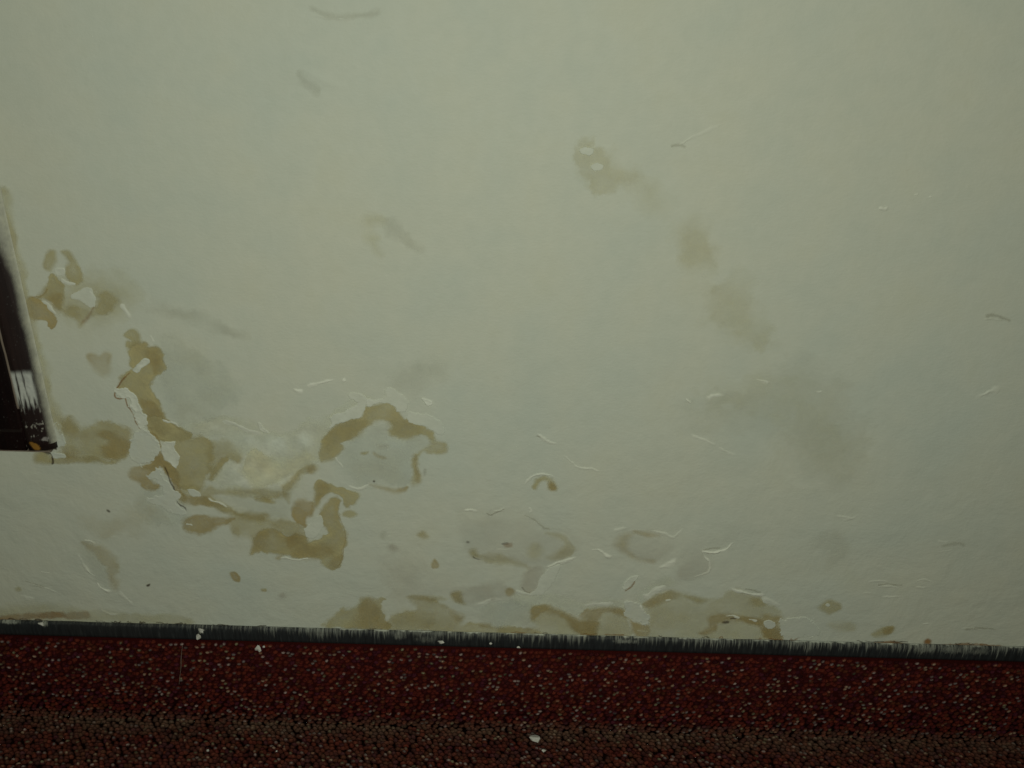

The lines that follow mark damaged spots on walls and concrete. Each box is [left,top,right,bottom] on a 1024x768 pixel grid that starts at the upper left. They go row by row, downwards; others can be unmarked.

damp [23,252,241,533]
peeling [293,377,446,435]